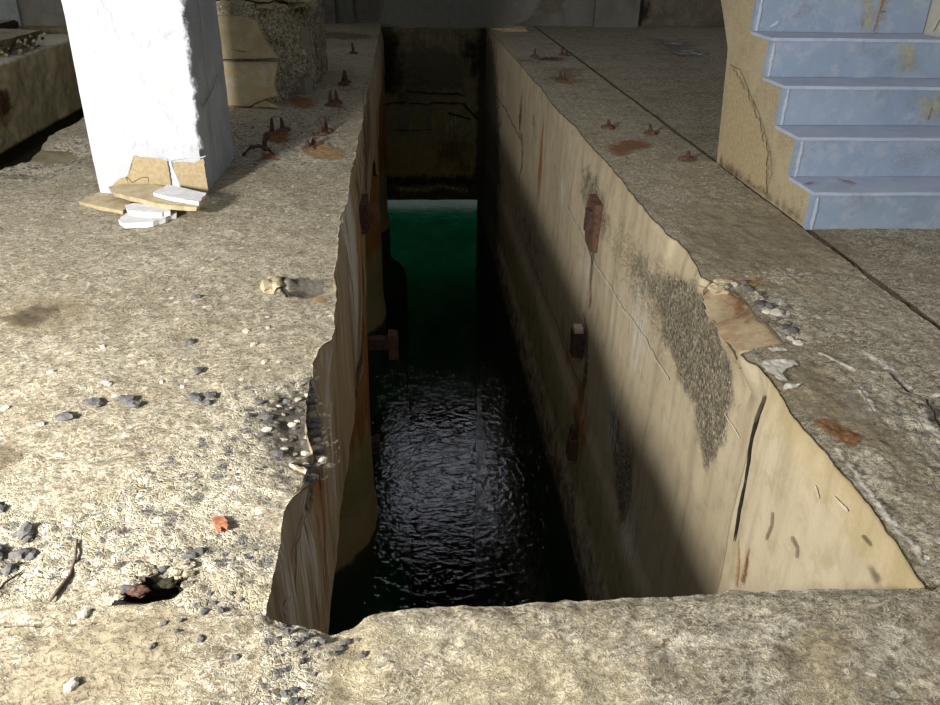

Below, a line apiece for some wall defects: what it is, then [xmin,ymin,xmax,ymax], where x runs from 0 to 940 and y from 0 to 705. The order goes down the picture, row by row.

peeling [380,0,541,29]
crack [197,0,278,177]
crack [385,90,480,131]
crack [730,64,772,190]
spalling [694,279,805,369]
crack [733,395,766,541]
rust [814,418,860,447]
crack [836,365,940,440]